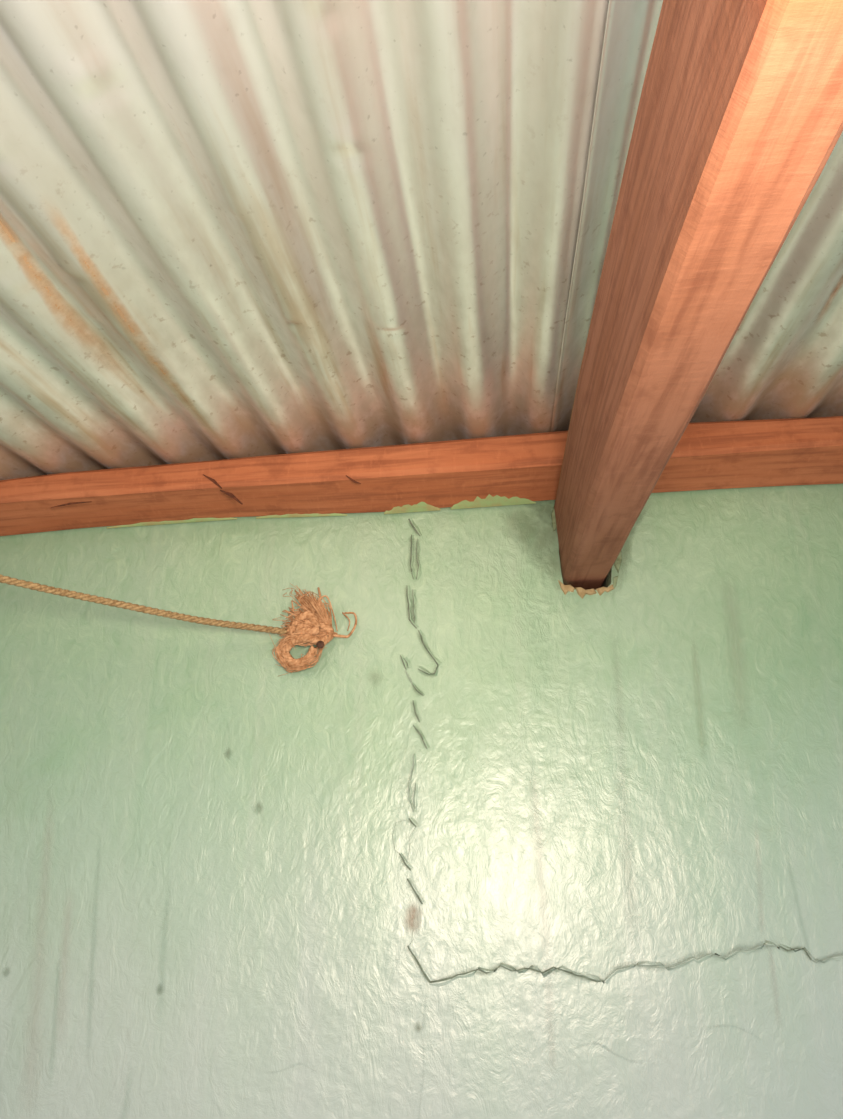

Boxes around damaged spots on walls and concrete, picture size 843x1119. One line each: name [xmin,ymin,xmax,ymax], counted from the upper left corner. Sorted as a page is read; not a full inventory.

spalling [558,551,622,599]
crack [392,518,442,904]
crack [407,936,843,987]